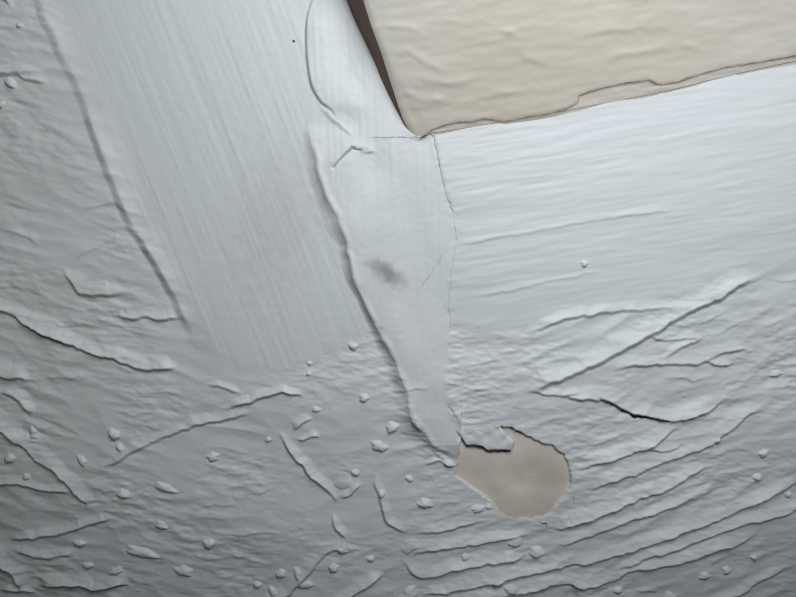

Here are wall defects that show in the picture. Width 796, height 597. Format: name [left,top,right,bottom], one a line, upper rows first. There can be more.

peeling [559,56,796,112]
peeling [429,119,501,133]
crack [602,400,668,422]
peeling [452,419,571,519]